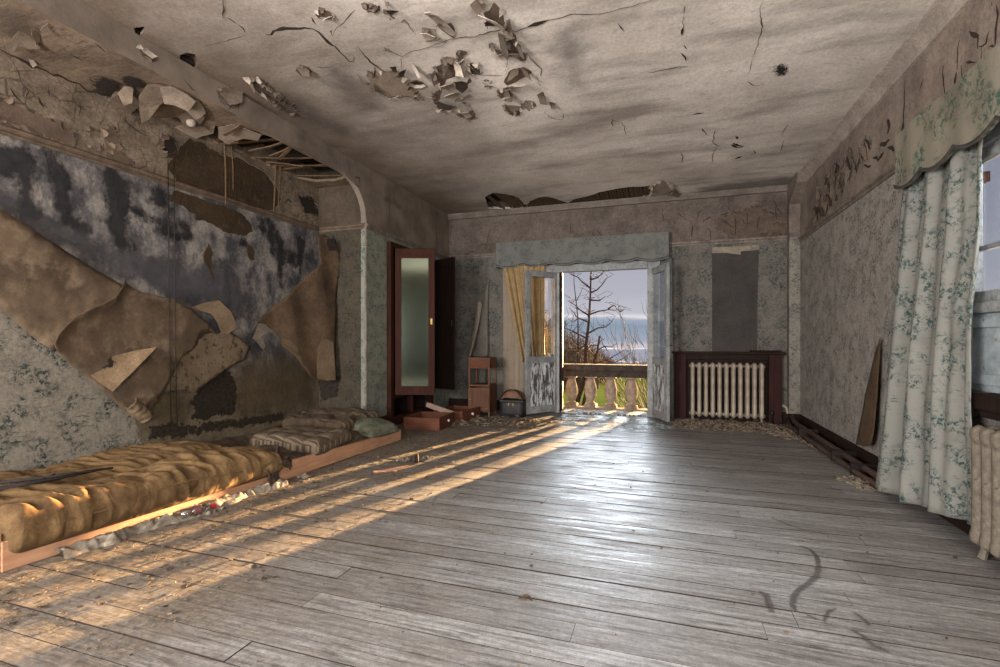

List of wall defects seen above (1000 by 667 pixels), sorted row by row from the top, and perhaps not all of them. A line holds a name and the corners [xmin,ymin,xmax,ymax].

leakage [90,76,144,96]
peeling [136,44,158,64]
peeling [217,76,299,116]
peeling [314,7,335,21]
crack [205,0,652,100]
peeling [358,0,564,121]
leakage [0,146,246,319]
spalling [109,82,281,260]
spalling [203,243,214,280]
leakage [257,217,305,290]
leakage [299,196,318,216]
peeling [805,135,872,231]